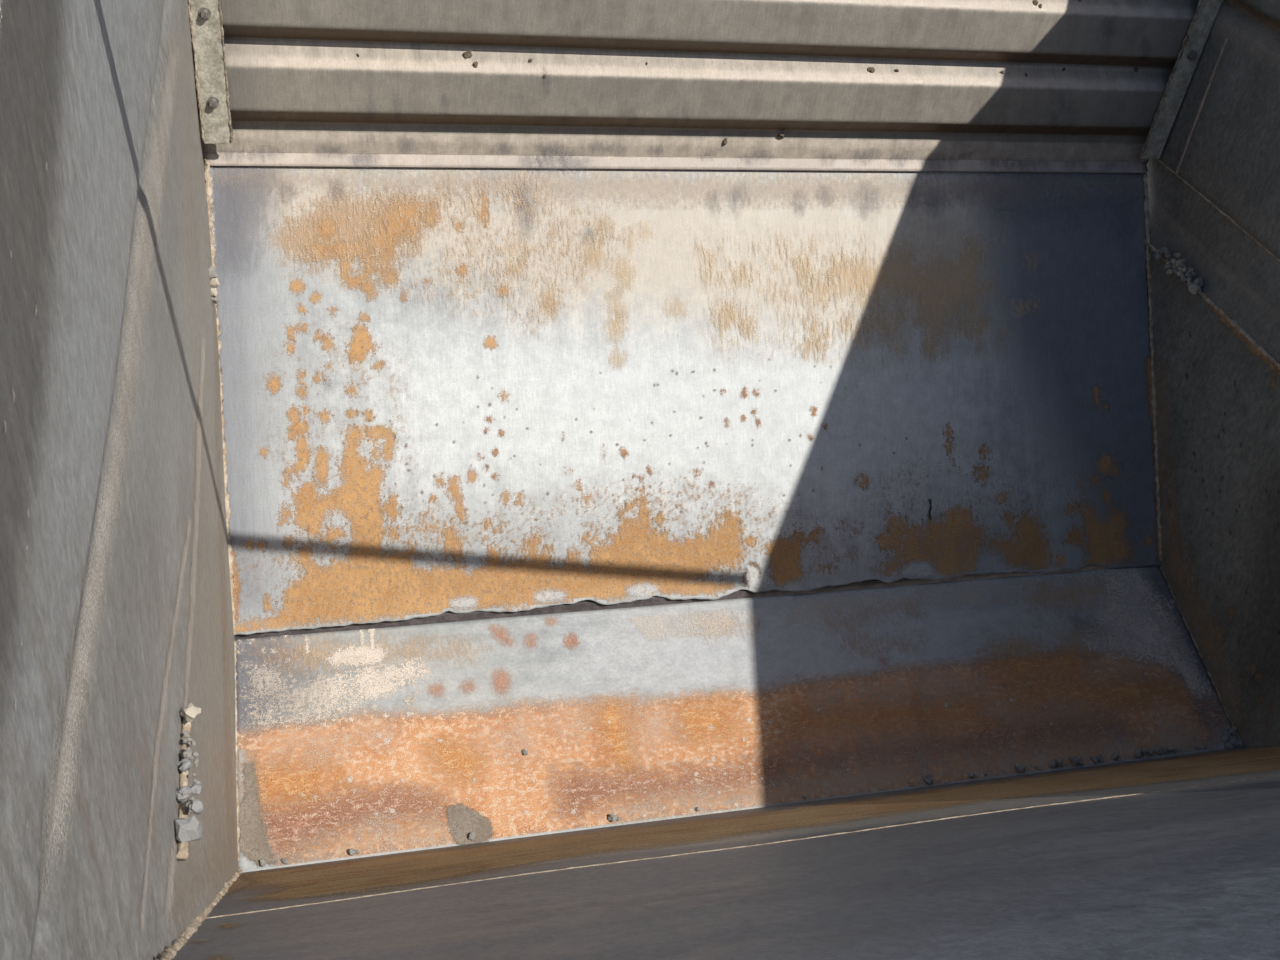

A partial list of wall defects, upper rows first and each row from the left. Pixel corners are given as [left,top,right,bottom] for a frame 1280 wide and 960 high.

corrosion [222,175,1280,902]
peeling [741,561,772,589]
peeling [449,596,478,609]
peeling [533,589,568,603]
peeling [626,582,658,597]